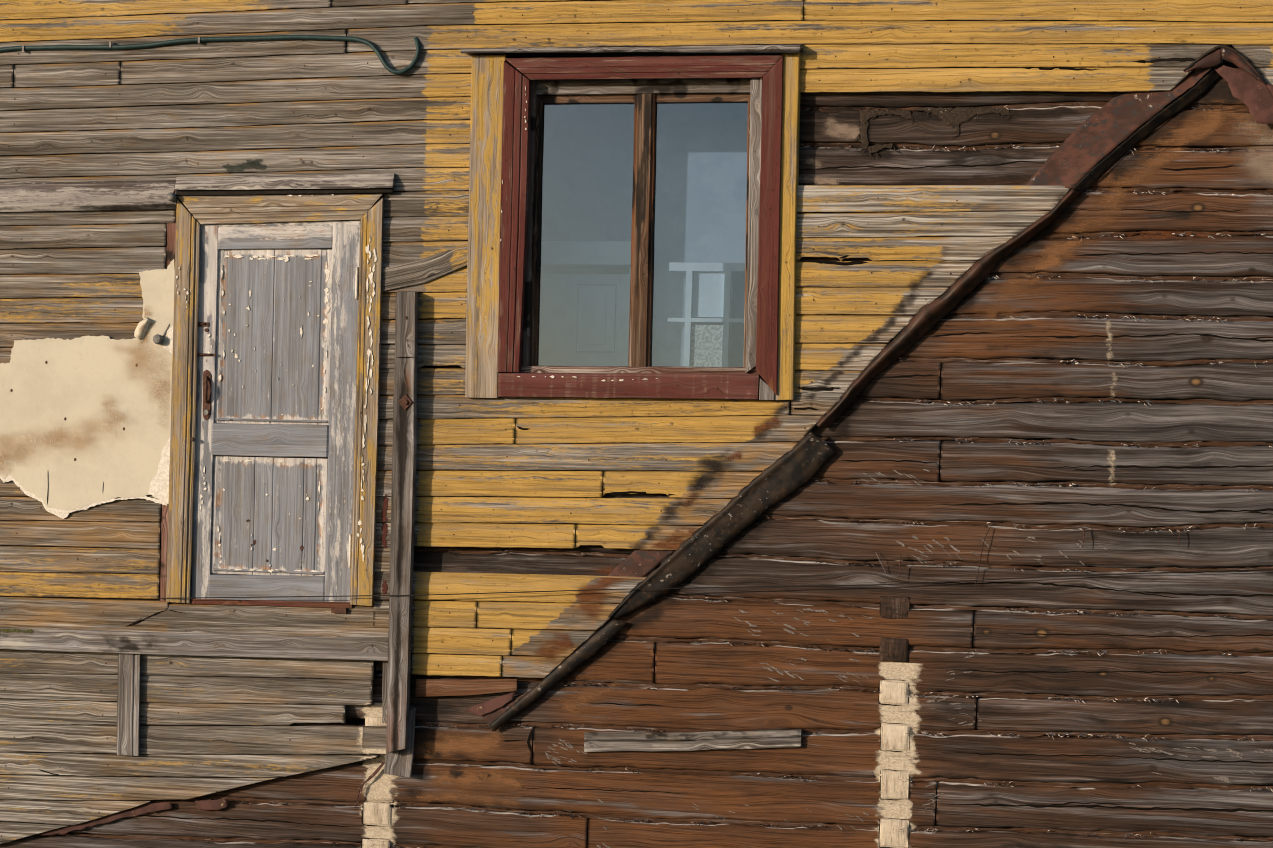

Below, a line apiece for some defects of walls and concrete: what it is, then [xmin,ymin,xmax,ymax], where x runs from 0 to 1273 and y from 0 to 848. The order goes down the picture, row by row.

peeling [207,254,331,373]
peeling [361,236,377,500]
corrosion [754,418,781,433]
peeling [217,526,320,573]
corrosion [578,568,621,617]